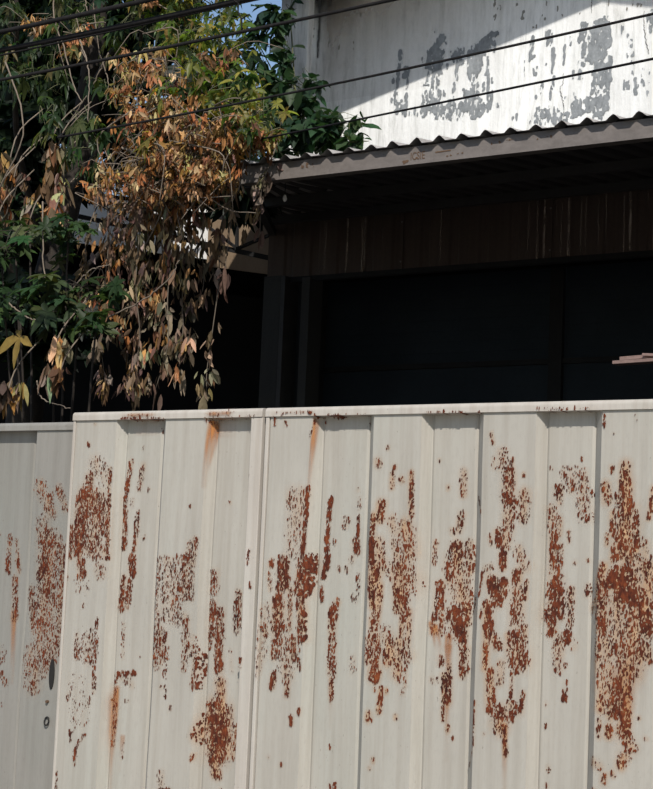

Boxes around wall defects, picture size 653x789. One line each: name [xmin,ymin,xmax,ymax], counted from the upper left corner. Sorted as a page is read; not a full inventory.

peeling [390,31,499,121]
peeling [524,15,650,125]
corrosion [204,409,255,451]
corrosion [0,533,21,631]
corrosion [23,456,112,696]
corrosion [66,618,99,766]
corrosion [119,459,150,658]
corrosion [153,535,251,789]
corrosion [255,432,531,757]
corrosion [542,456,653,785]